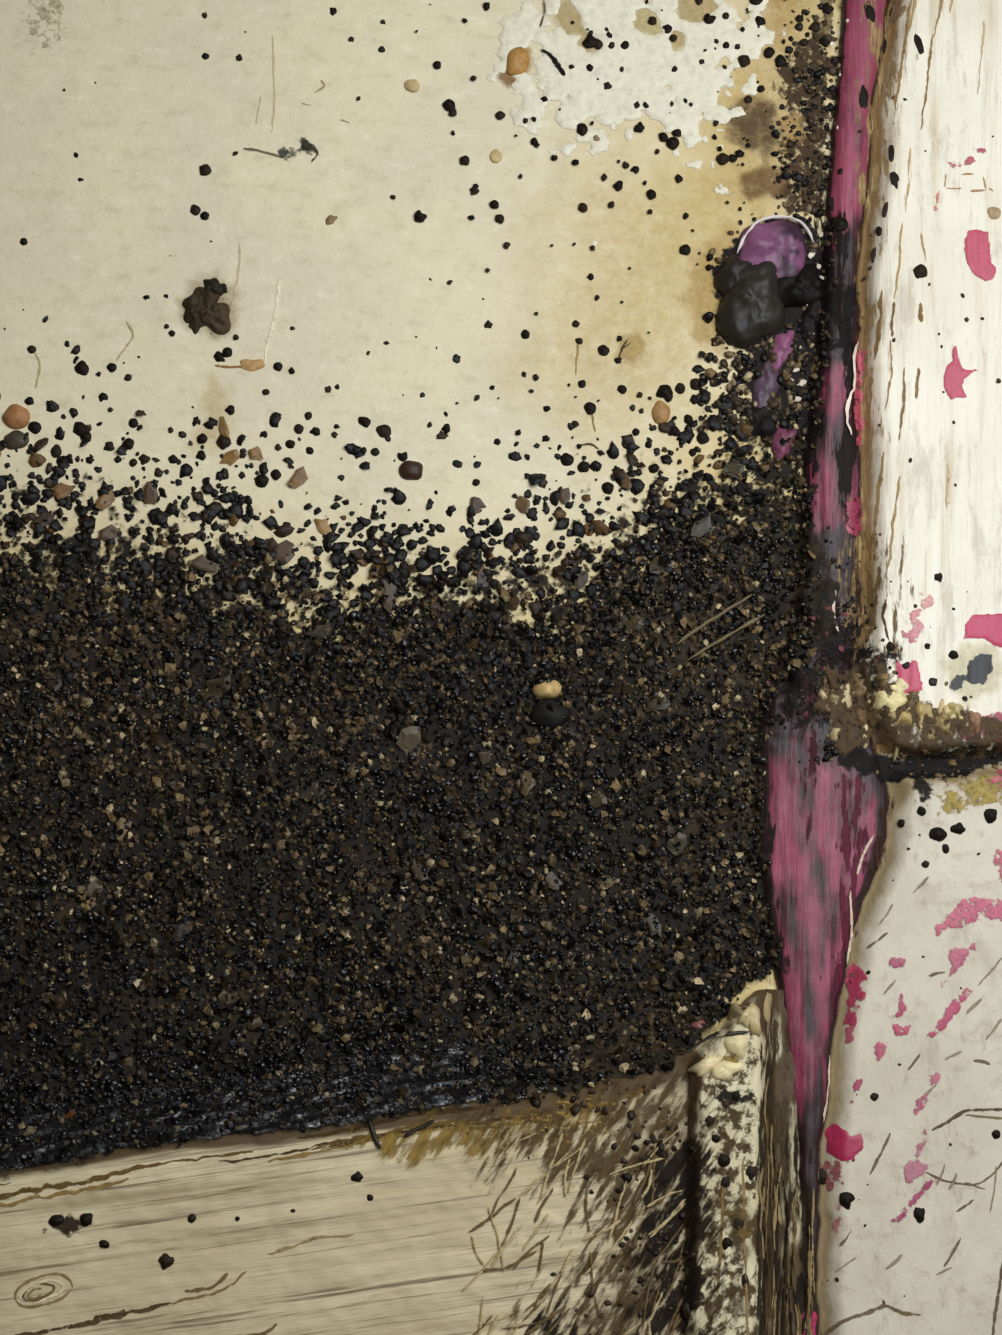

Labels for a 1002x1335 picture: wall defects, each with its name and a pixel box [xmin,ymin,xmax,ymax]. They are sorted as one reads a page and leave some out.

water stain [695,0,729,24]
water stain [571,21,629,50]
water stain [699,27,751,77]
water stain [515,117,579,165]
water stain [577,121,594,136]
water stain [634,101,681,154]
water stain [260,412,282,438]
water stain [341,416,391,469]
water stain [427,385,500,439]
water stain [508,429,530,461]
water stain [282,457,308,495]
water stain [43,1213,93,1237]